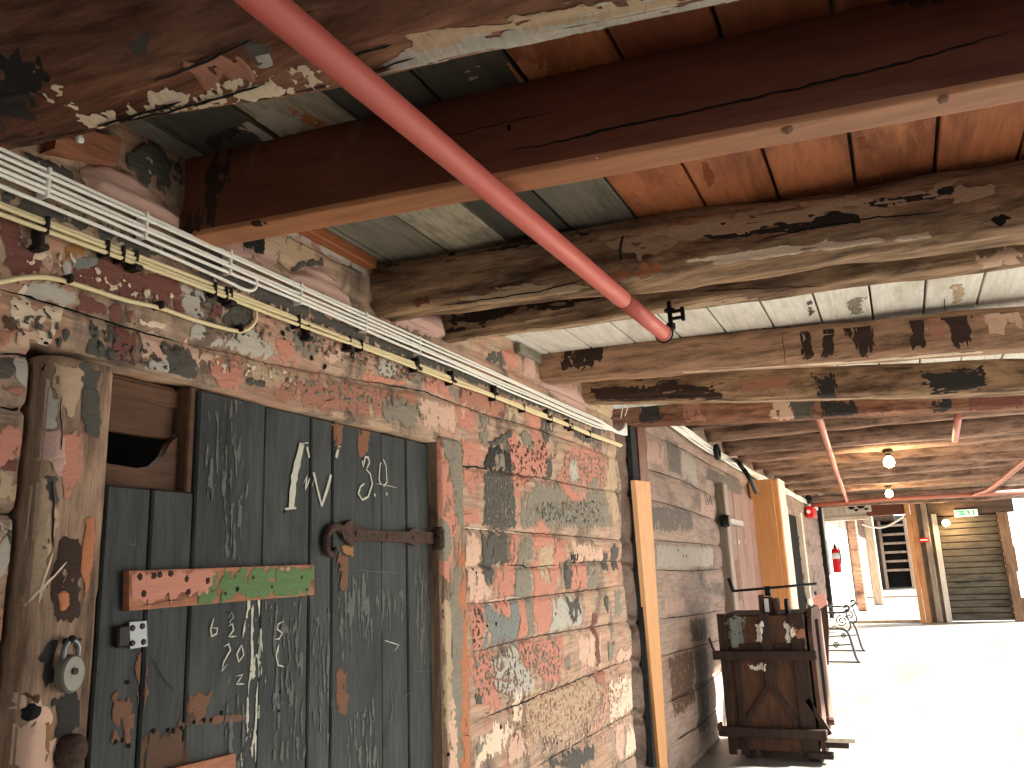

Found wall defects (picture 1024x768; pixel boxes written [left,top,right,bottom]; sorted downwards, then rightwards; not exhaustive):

peeling [378,0,737,83]
peeling [43,54,330,142]
crack [513,30,1013,151]
peeling [606,177,996,283]
peeling [973,246,1022,269]
peeling [684,297,758,310]
peeling [682,351,983,373]
peeling [640,397,903,422]
peeling [0,212,636,768]